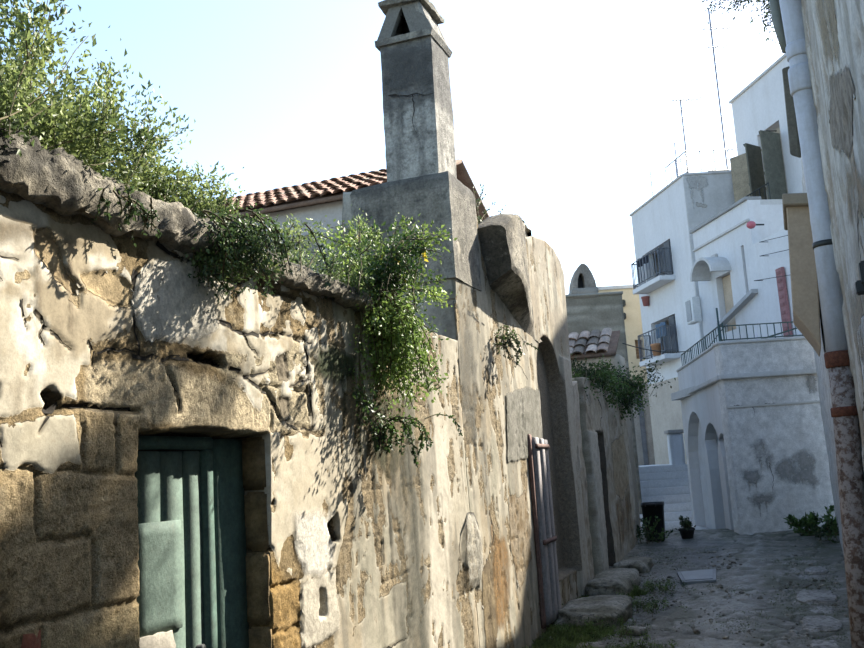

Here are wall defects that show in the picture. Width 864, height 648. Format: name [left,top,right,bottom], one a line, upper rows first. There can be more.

crack [388,93,433,130]
spalling [33,227,134,305]
crack [156,241,242,284]
crack [21,270,314,430]
spalling [187,353,217,366]
spalling [275,352,289,381]
hole [40,391,63,410]
spalling [277,397,291,420]
leakage [744,441,817,506]
spalling [482,549,498,648]